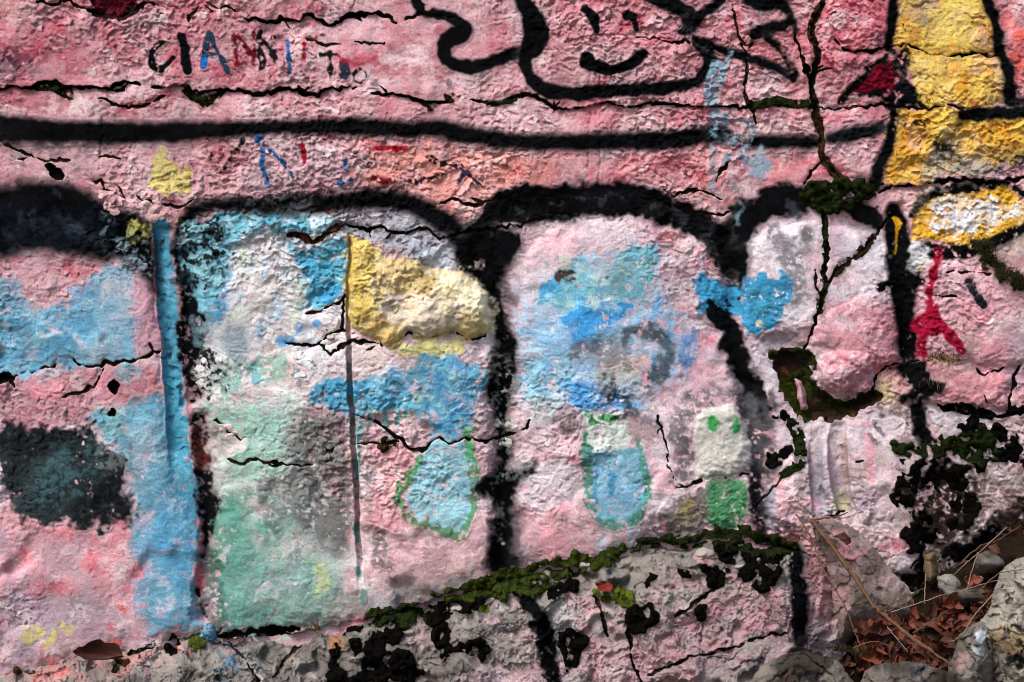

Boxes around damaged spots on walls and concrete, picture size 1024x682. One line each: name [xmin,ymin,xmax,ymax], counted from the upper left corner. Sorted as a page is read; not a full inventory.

crack [0,0,757,125]
crack [794,0,996,116]
crack [803,150,822,185]
crack [286,293,487,356]
crack [9,342,161,398]
crack [213,413,531,468]